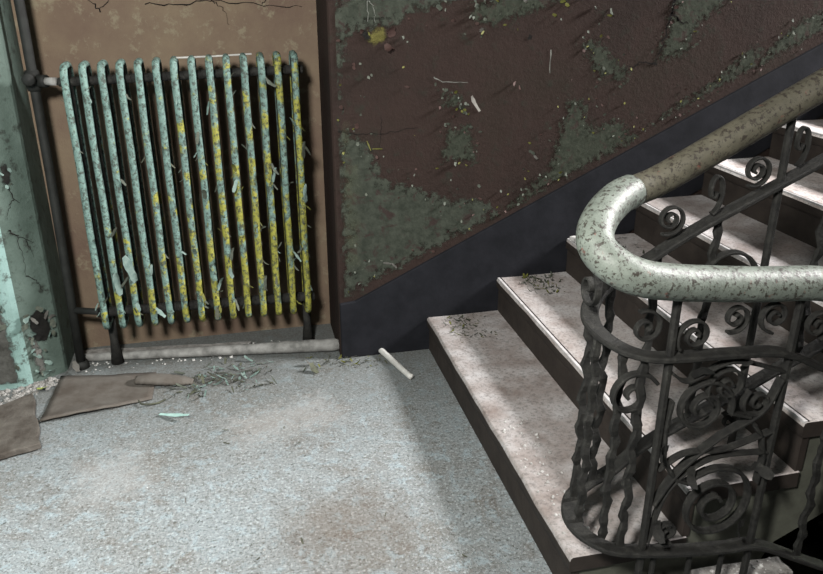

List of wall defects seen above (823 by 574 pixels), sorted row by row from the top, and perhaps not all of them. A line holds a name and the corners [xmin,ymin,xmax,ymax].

crack [145,0,302,25]
peeling [0,164,12,189]
peeling [335,0,823,297]
peeling [0,305,20,385]
peeling [21,306,56,376]